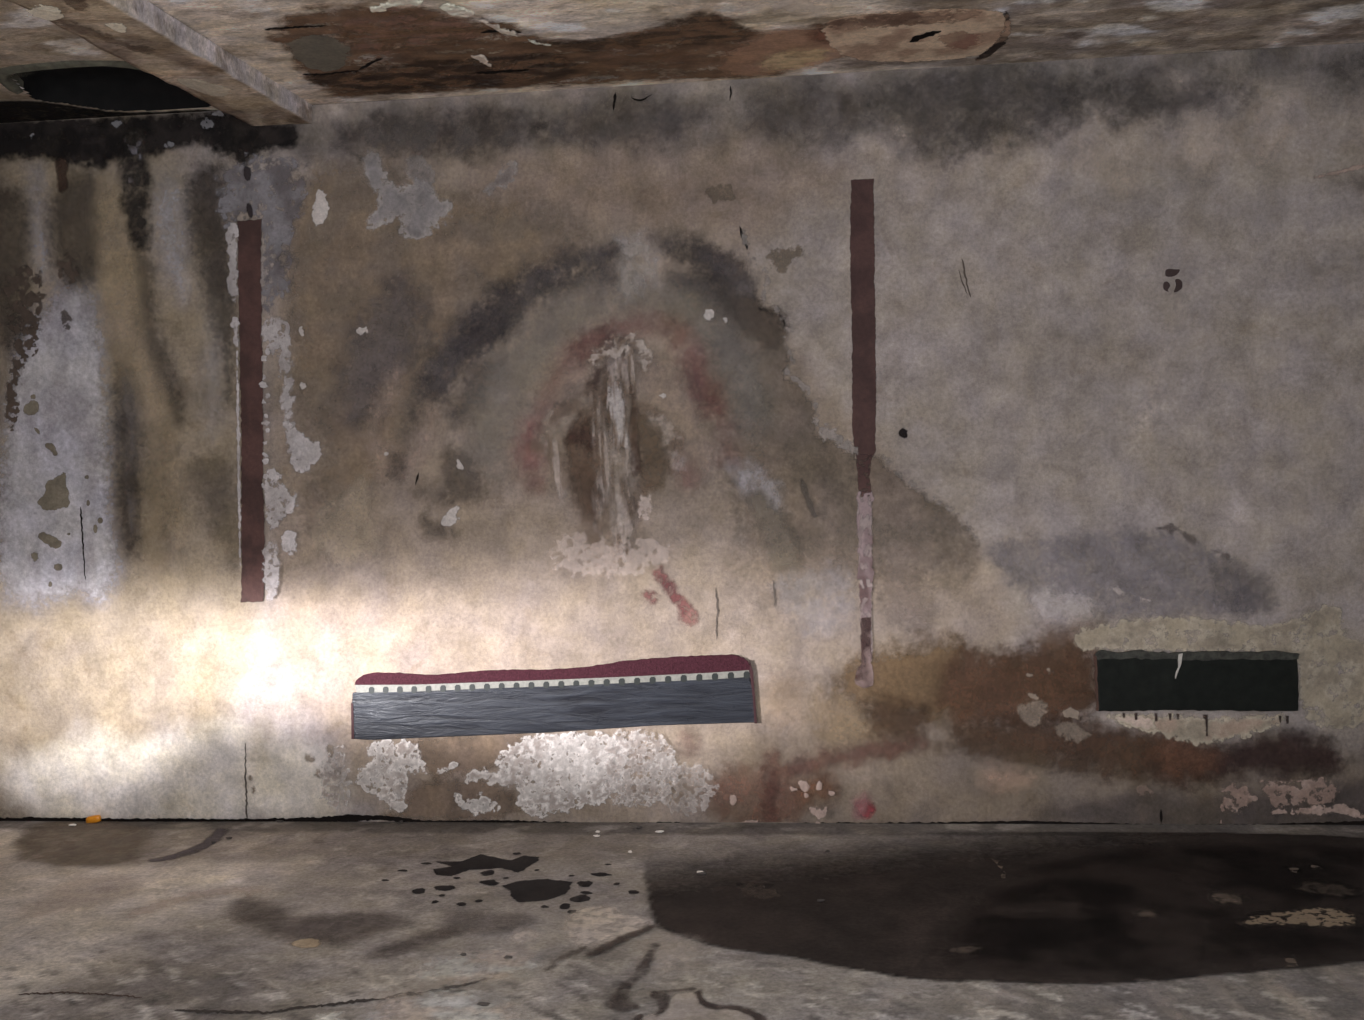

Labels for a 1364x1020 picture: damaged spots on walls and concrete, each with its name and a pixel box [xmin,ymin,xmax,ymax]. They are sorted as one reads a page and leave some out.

flaking render [370,0,424,12]
spalling [821,8,1011,63]
peeling [37,472,70,510]
leakage [0,120,180,608]
leakage [186,153,652,600]
leakage [532,332,684,562]
leakage [663,235,976,590]
flaking render [1074,604,1364,729]
peeling [305,729,681,819]
flaking render [1107,713,1284,747]
rust [1190,732,1341,777]
leakage [646,832,1364,984]